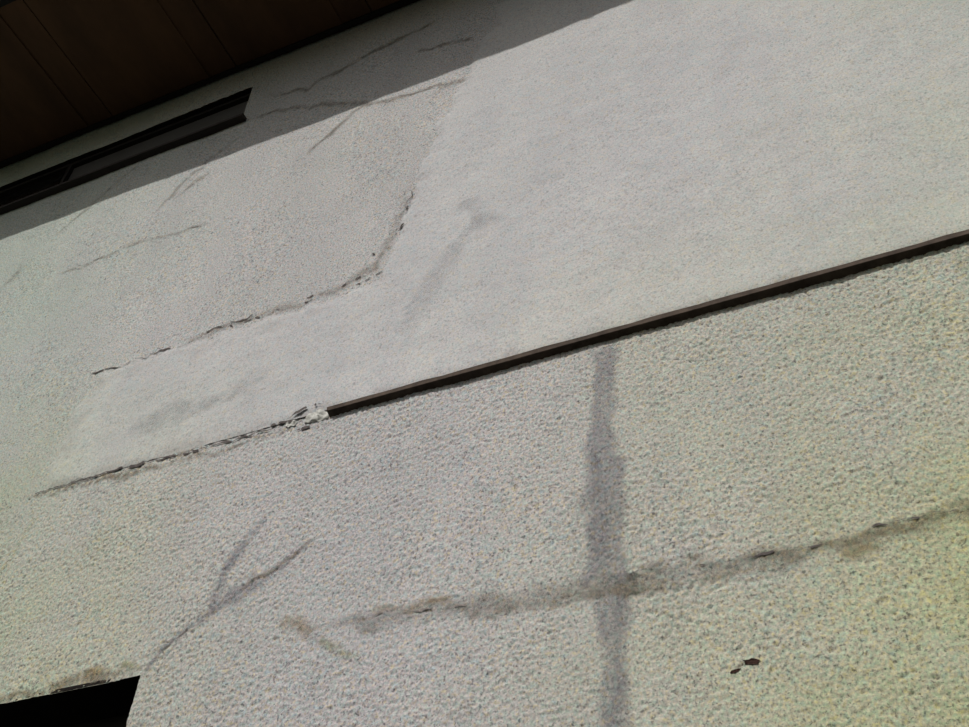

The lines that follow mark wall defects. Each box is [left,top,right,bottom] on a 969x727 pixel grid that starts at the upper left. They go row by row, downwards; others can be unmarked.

crack [93,253,382,374]
crack [35,418,298,494]
damp [558,351,664,637]
damp [689,509,957,569]
crack [145,552,297,669]